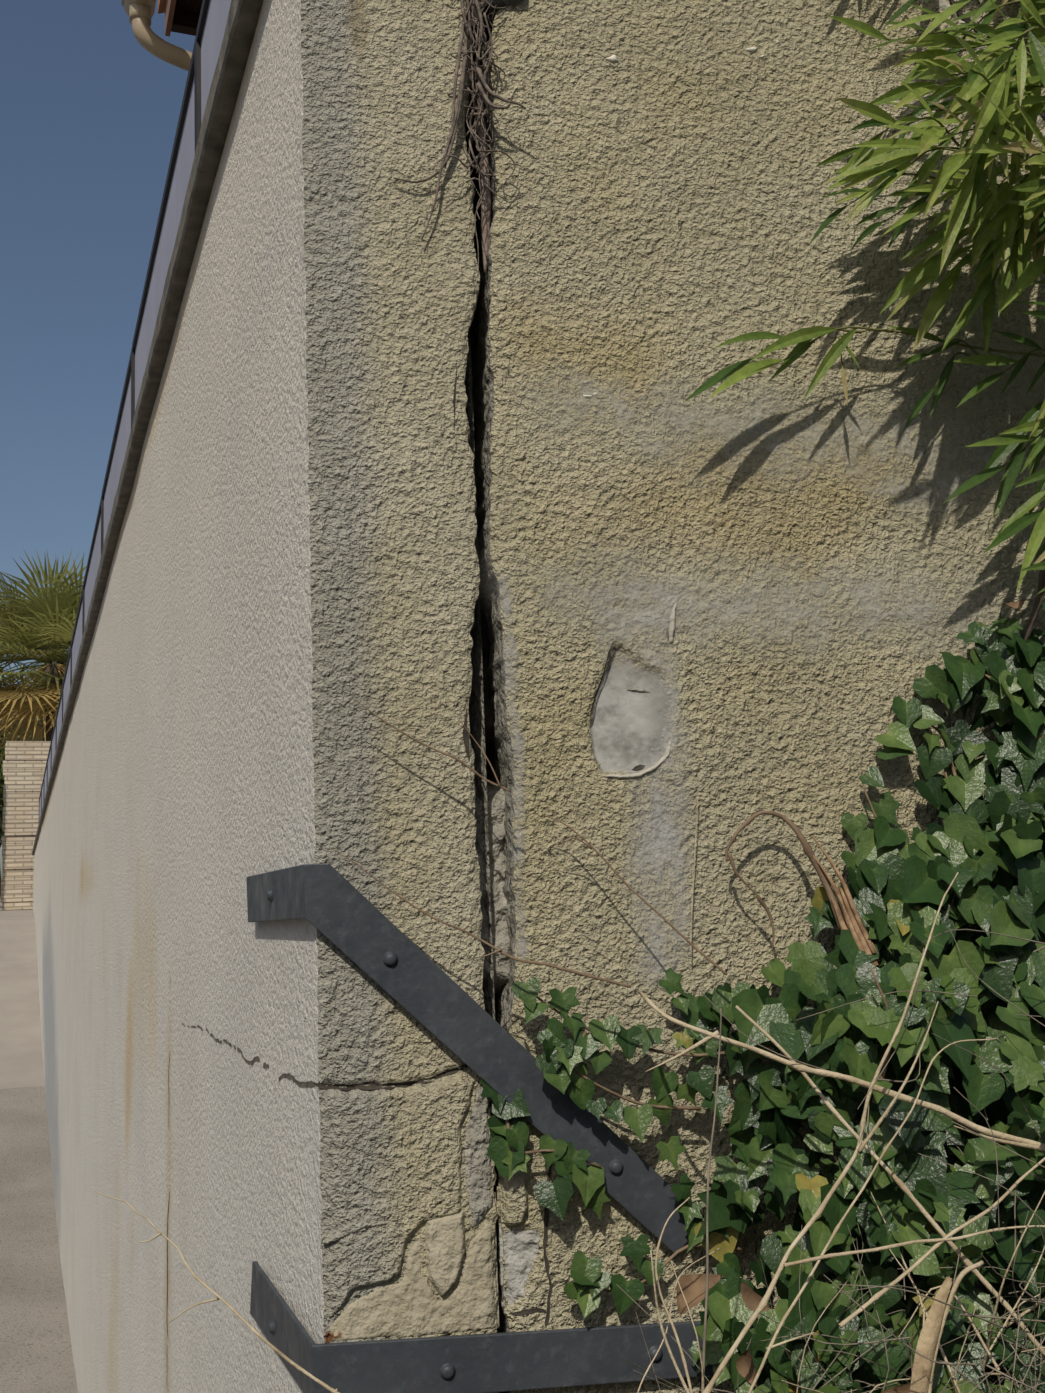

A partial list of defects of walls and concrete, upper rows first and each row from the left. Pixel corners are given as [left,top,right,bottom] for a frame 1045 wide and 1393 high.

crack [465,0,492,266]
crack [453,312,477,449]
spalling [590,595,680,780]
crack [463,607,510,1000]
crack [168,1023,467,1091]
crack [164,1191,172,1295]
crack [508,1164,552,1327]